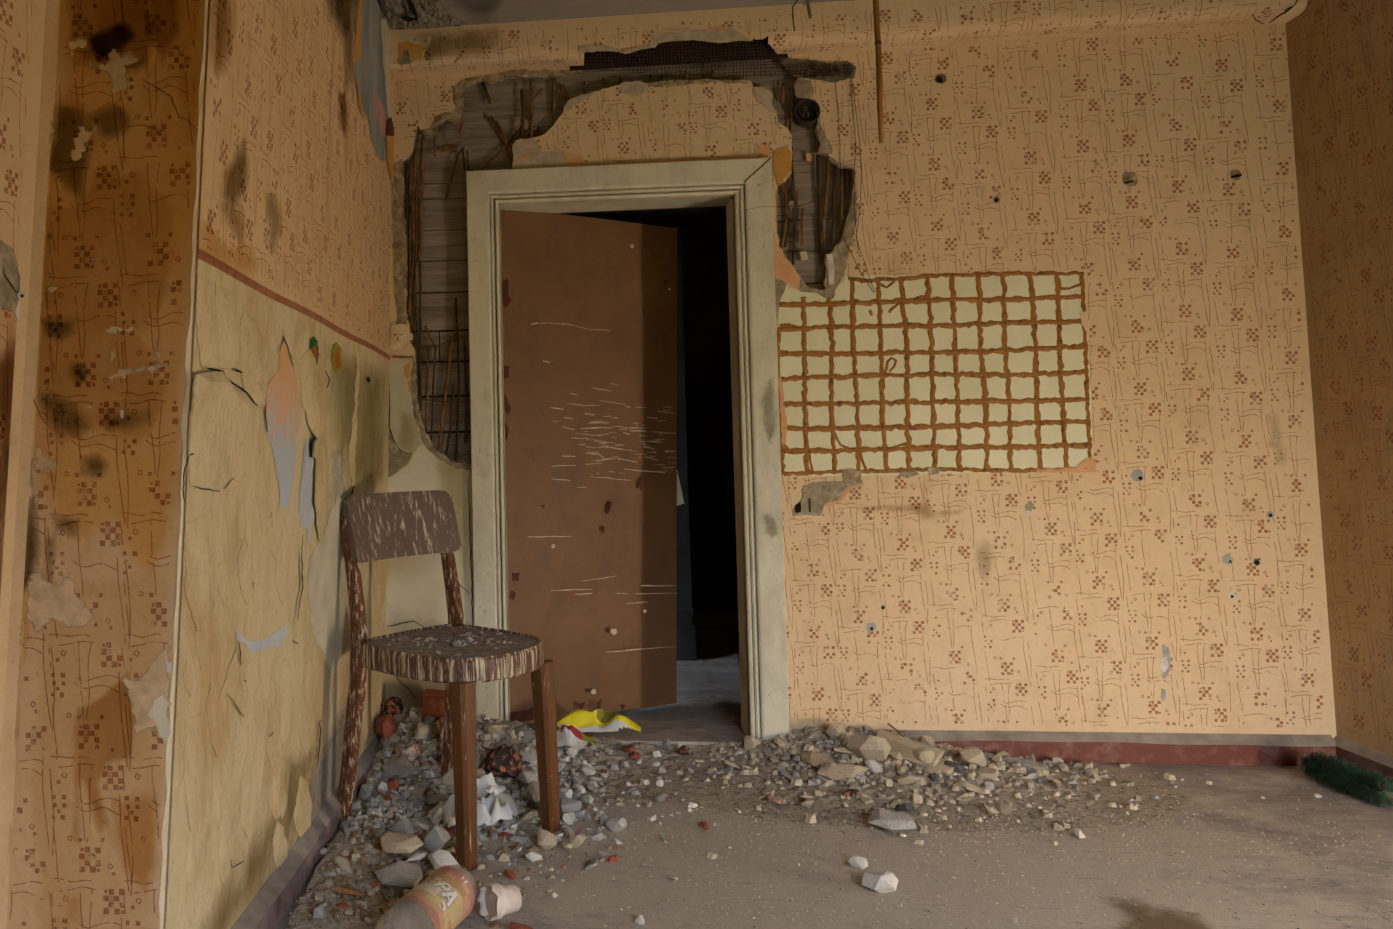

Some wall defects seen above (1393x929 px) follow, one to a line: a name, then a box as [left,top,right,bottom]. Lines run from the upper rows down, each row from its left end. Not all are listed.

peeling [68,38,137,93]
leakage [90,23,133,58]
peeling [71,126,97,161]
flaking render [355,0,863,635]
peeling [106,326,168,380]
peeling [123,0,208,929]
peeling [264,337,349,671]
peeling [19,571,92,646]
peeling [510,708,534,722]
leakage [1119,903,1208,929]